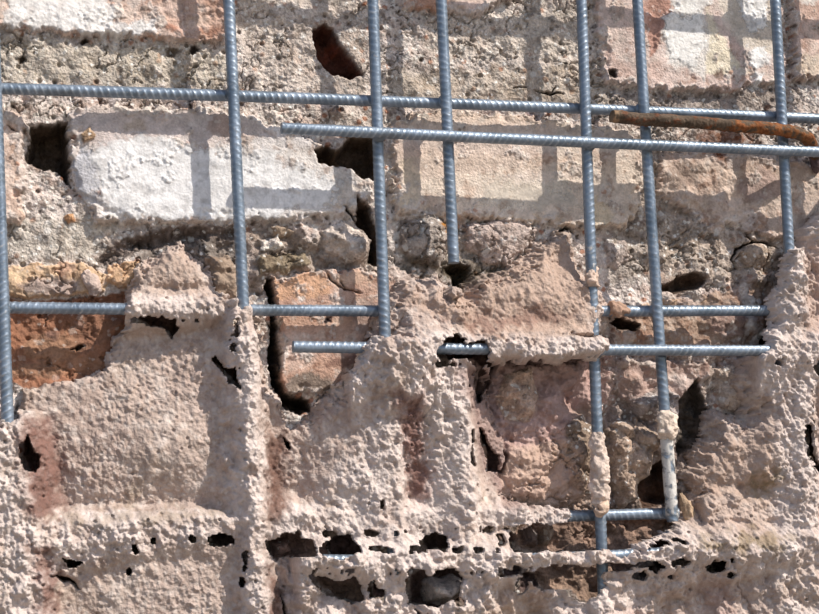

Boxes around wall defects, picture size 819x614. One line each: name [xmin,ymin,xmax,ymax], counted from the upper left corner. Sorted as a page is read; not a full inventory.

peeling [3,0,157,45]
spalling [156,0,225,42]
peeling [647,0,713,70]
peeling [737,0,768,32]
peeling [750,47,771,91]
rust [698,132,750,142]
peeling [88,133,234,269]
peeling [242,148,343,218]
crack [730,236,772,270]
spalling [9,290,126,303]
spalling [10,314,131,389]